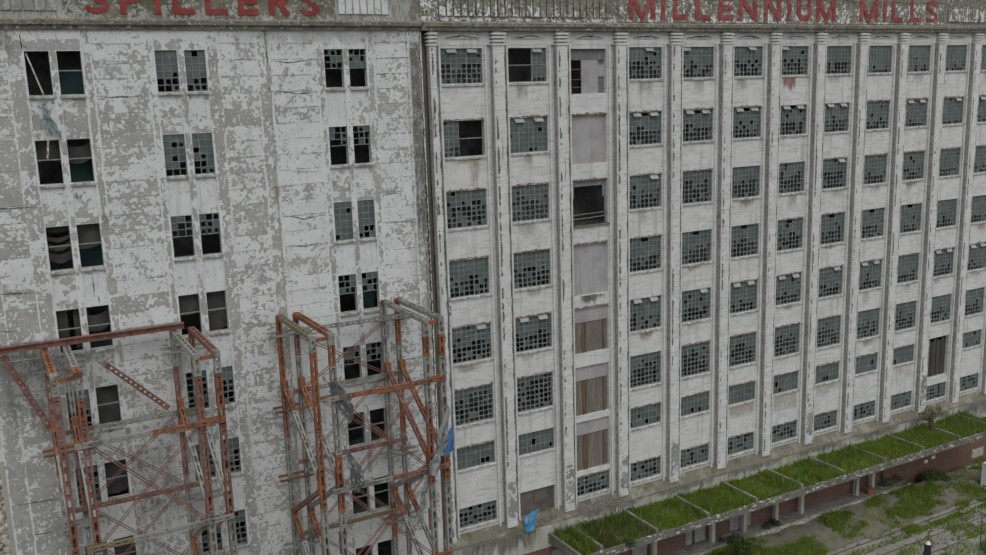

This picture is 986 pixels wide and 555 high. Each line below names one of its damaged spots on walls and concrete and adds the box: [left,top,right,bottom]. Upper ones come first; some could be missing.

peeling [62,0,986,25]